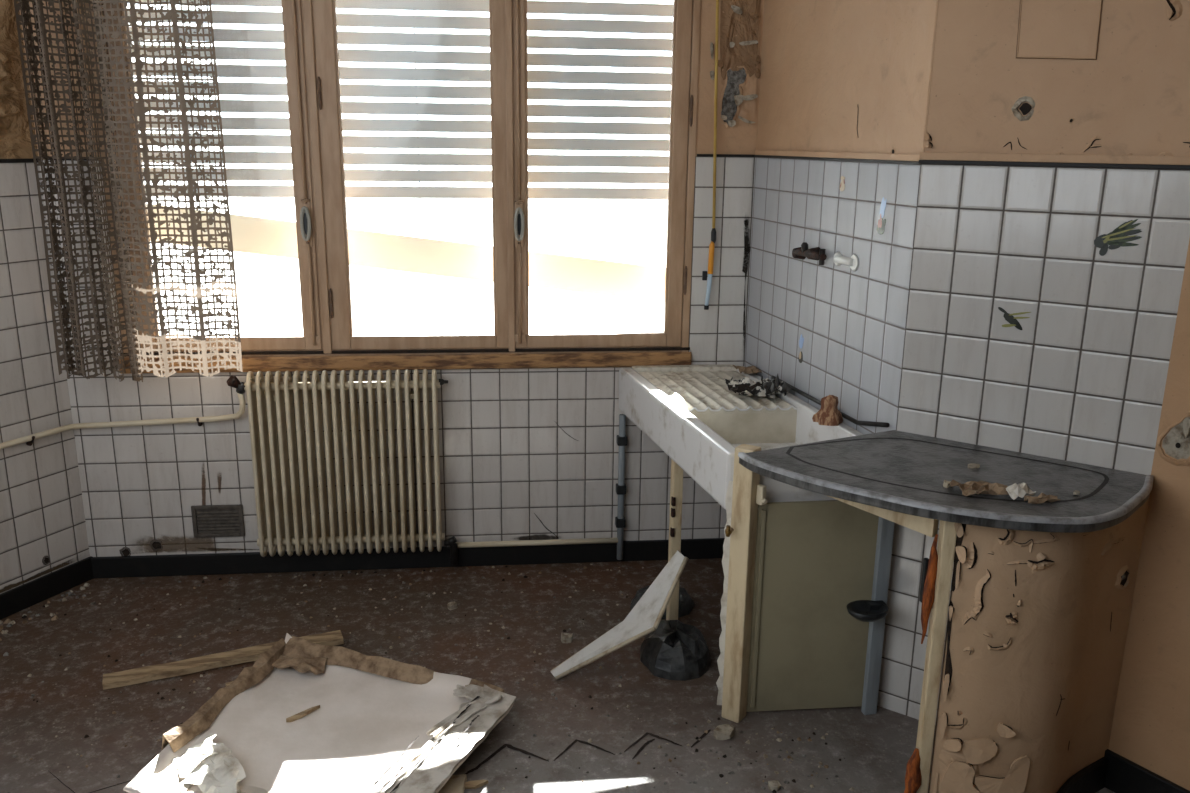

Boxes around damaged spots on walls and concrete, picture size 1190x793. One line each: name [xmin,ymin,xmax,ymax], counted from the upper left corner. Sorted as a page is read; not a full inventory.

peeling [710,0,761,128]
spalling [1156,412,1190,466]
peeling [933,523,1030,793]